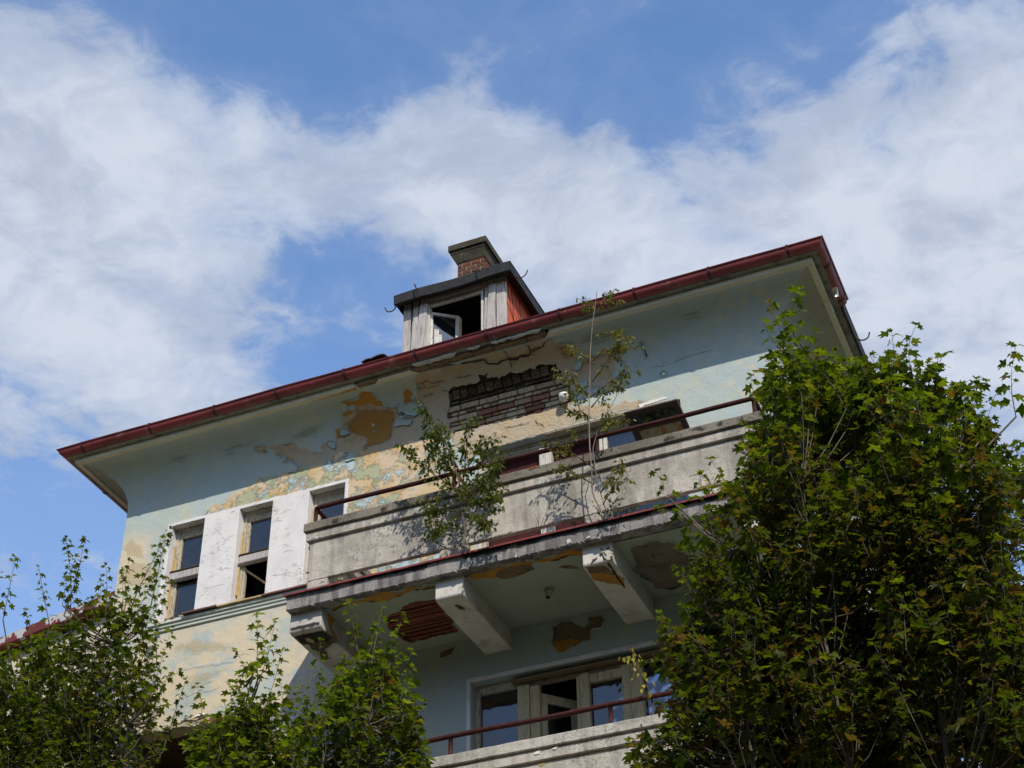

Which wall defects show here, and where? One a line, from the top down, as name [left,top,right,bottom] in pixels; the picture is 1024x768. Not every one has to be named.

crack [418,340,548,397]
peeling [203,337,668,515]
peeling [369,554,439,574]
spalling [454,523,690,590]
spalling [328,576,458,643]
peeling [550,614,607,653]